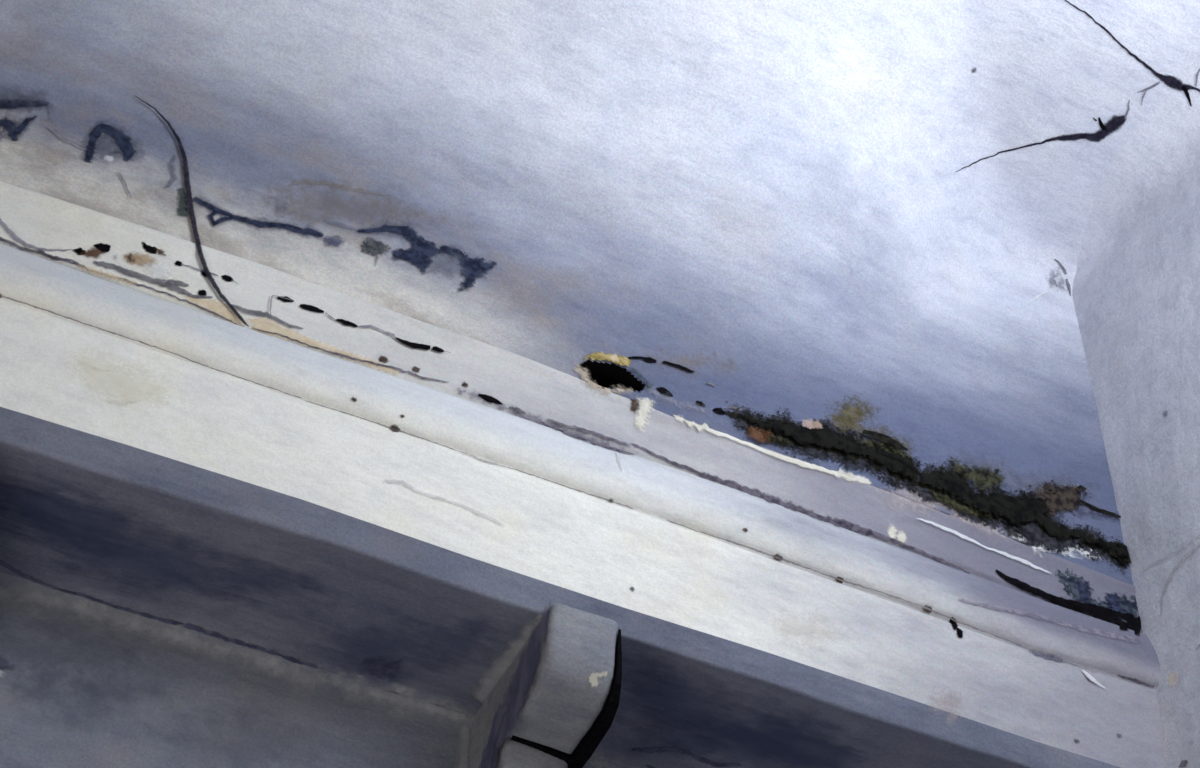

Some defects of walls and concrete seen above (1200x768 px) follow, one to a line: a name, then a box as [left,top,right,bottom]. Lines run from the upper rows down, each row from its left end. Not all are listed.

crack [956,0,1200,172]
crack [0,95,451,382]
crack [0,295,633,509]
spalling [576,352,695,428]
crack [653,382,745,415]
crack [385,480,504,526]
crack [669,521,1097,672]
crack [574,425,1200,636]
damp [725,399,1131,575]
damp [1055,569,1138,629]
crack [511,629,622,768]